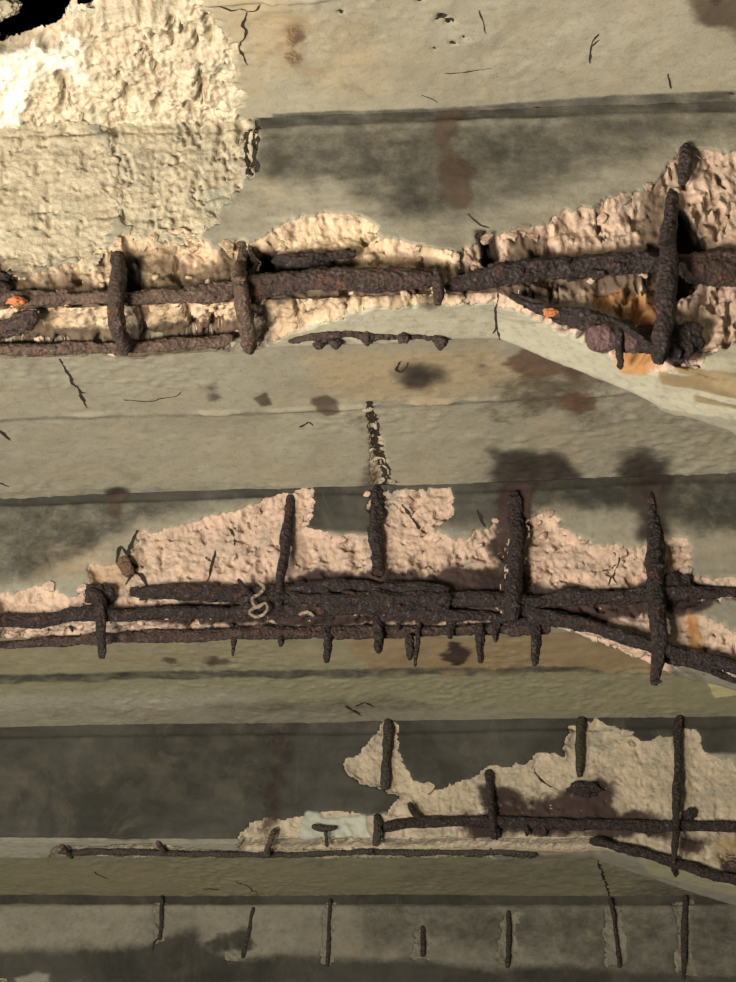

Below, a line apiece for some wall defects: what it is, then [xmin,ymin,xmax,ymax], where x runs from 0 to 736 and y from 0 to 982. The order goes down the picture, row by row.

crack [200,4,261,65]
spalling [0,0,736,373]
corrosion [0,269,105,310]
corrosion [271,251,359,273]
corrosion [444,265,658,332]
corrosion [116,314,240,358]
corrosion [504,350,580,378]
corrosion [621,321,706,375]
spalling [0,404,736,698]
corrosion [284,451,579,593]
spalling [50,718,736,886]
corrosion [463,778,706,854]